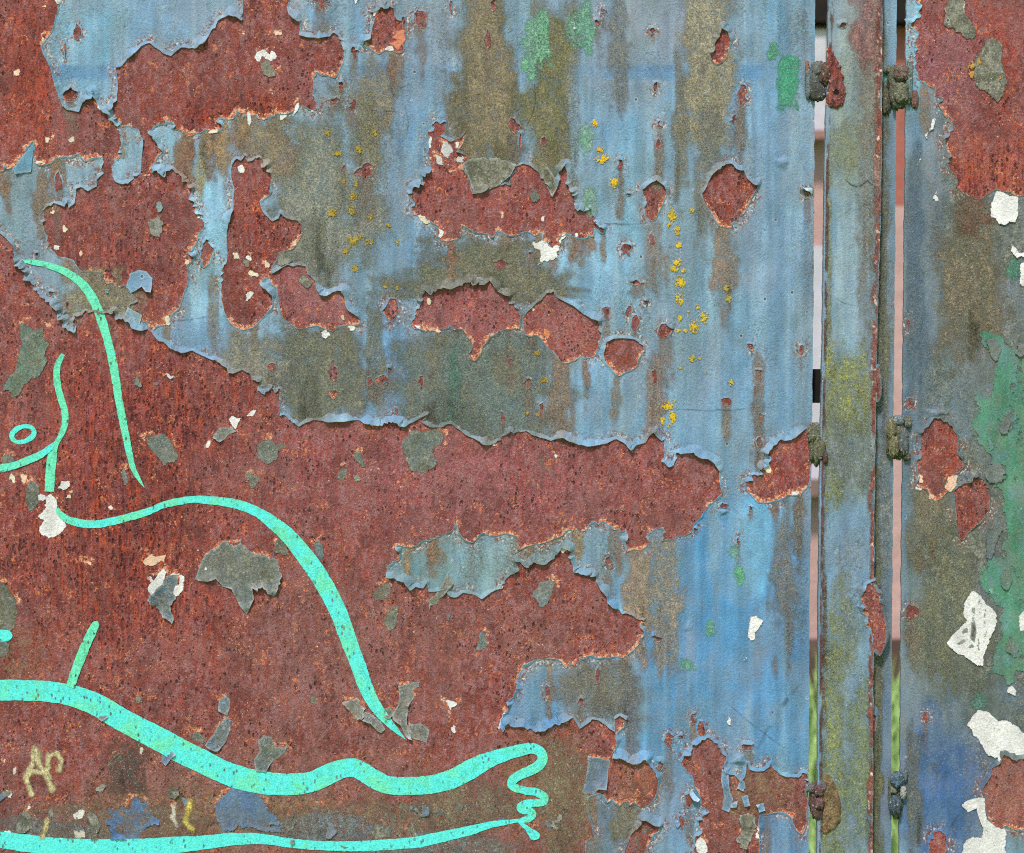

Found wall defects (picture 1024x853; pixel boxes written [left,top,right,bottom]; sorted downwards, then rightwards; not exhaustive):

peeling [60,84,80,123]
peeling [63,22,83,60]
corrosion [904,0,1024,236]
corrosion [700,160,762,293]
peeling [624,277,650,334]
corrosion [0,0,724,853]
corrosion [915,415,991,541]
corrosion [680,353,827,853]
corrosion [856,455,889,853]
peeling [958,601,987,650]
peeling [655,711,707,794]
peeling [676,789,700,840]